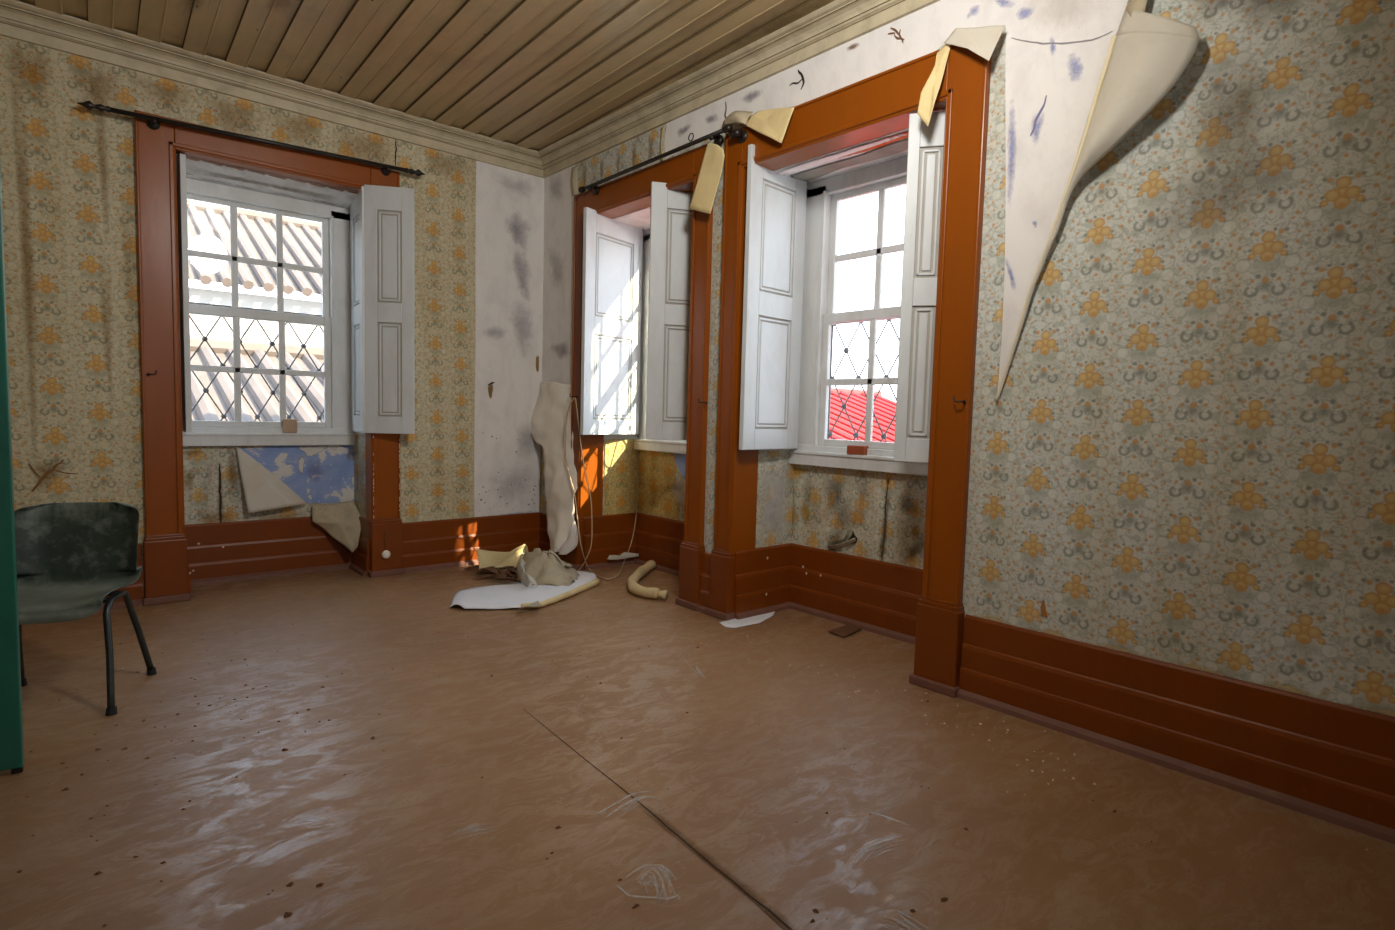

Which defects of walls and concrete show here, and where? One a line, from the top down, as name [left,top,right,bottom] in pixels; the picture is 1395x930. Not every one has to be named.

flaking render [240,445,354,503]
leakage [479,447,546,515]
flaking render [474,161,575,517]
flaking render [664,0,1128,403]